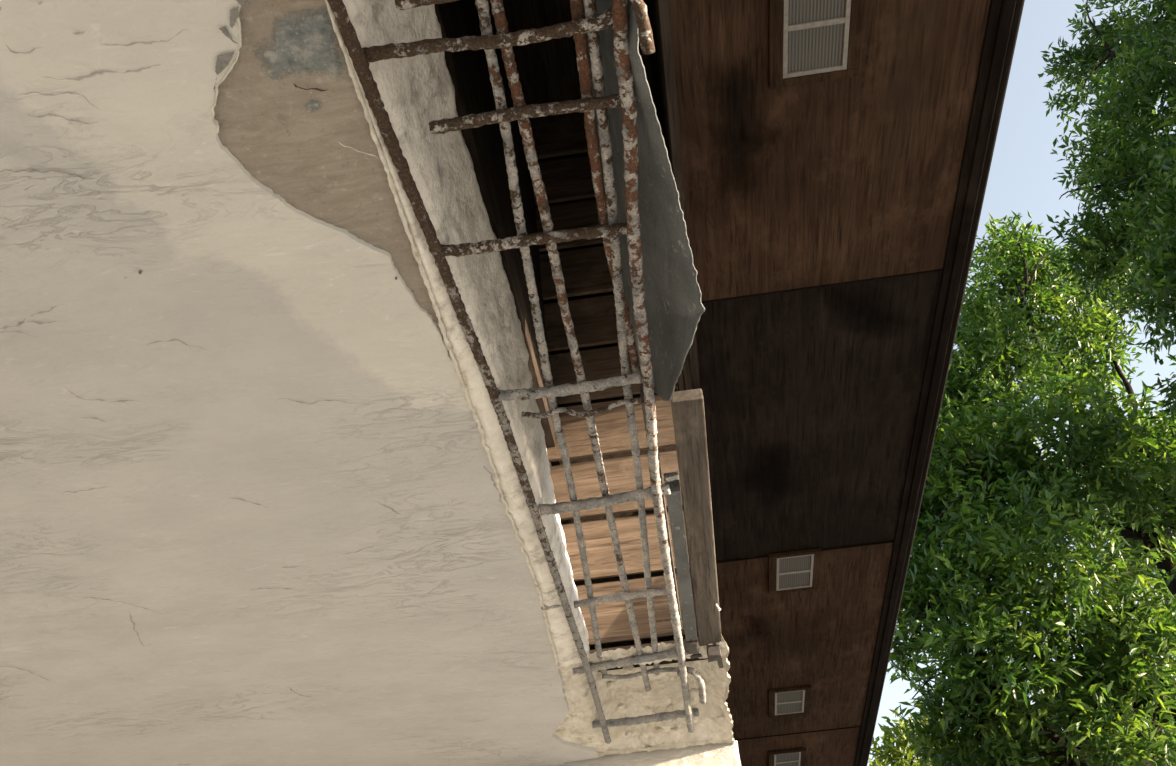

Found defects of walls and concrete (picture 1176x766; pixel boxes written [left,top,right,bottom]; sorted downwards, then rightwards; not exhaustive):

spalling [211,0,735,757]